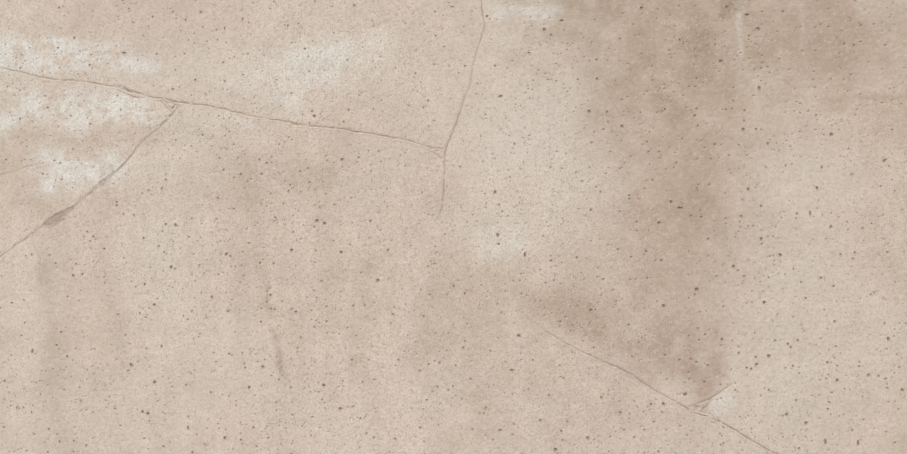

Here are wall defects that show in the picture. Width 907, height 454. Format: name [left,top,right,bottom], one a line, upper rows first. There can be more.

leakage [0,14,215,207]
crack [0,0,487,259]
leakage [210,20,410,131]
leakage [469,0,577,55]
leakage [630,0,787,104]
crack [516,310,780,454]
leakage [703,388,739,418]